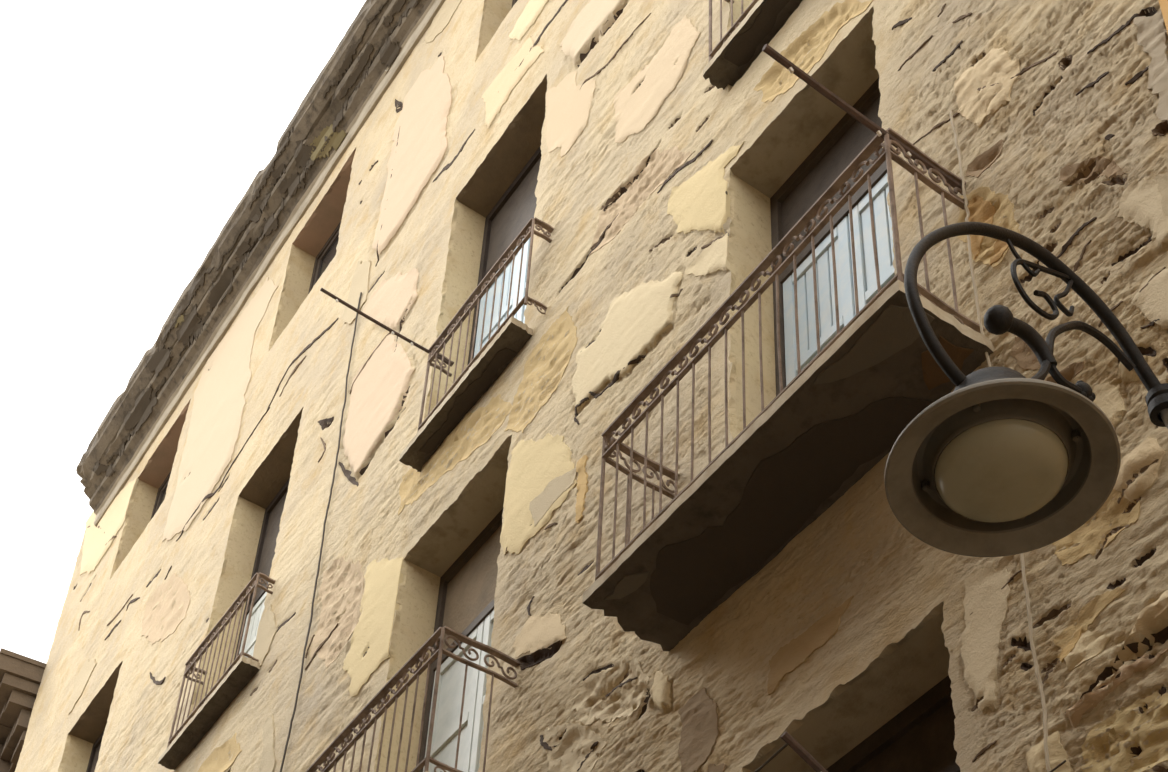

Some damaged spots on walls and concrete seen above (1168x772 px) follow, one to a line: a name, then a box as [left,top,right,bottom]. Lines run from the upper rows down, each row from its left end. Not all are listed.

spalling [398,306,578,516]
spalling [198,733,242,772]